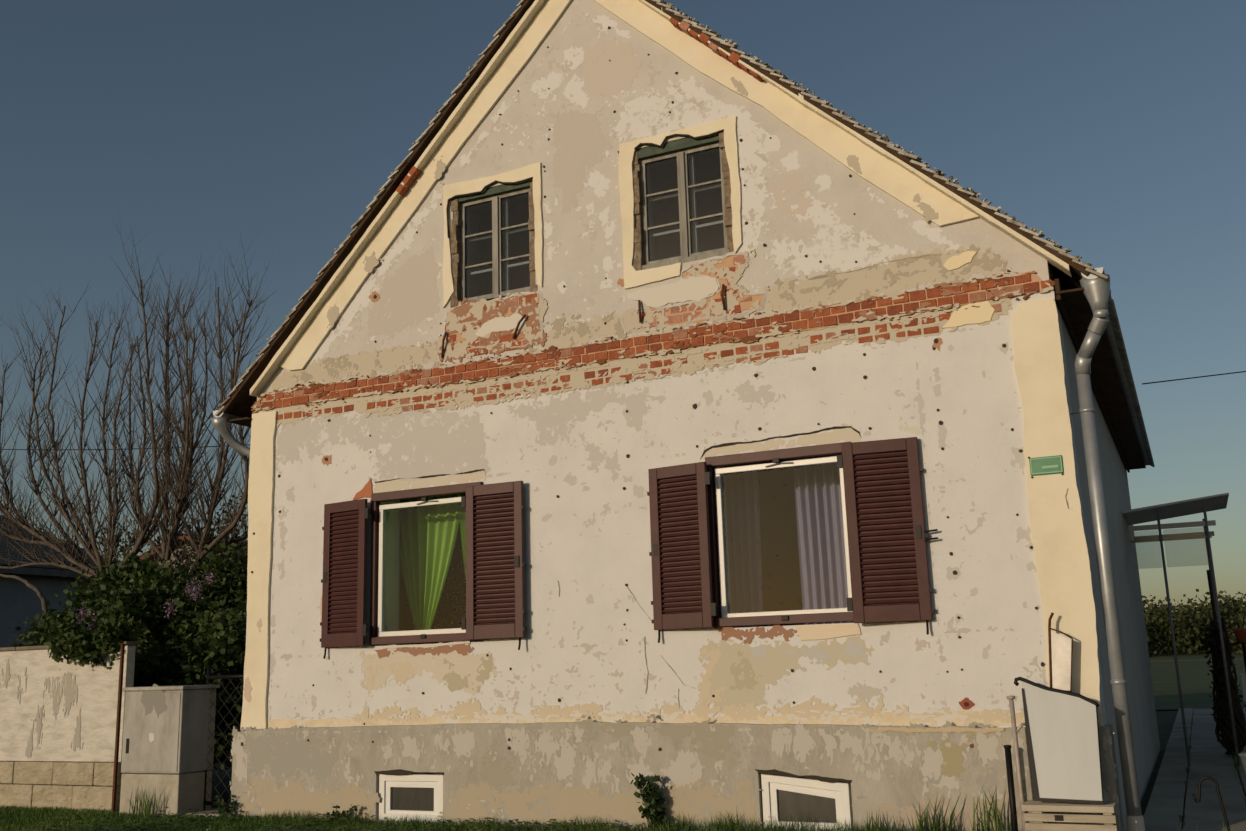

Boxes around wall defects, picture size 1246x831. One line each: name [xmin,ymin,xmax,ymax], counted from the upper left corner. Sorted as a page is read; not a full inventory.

peeling [251,15,1055,500]
leakage [0,659,27,704]
leakage [25,669,84,758]
spalling [354,624,1011,790]